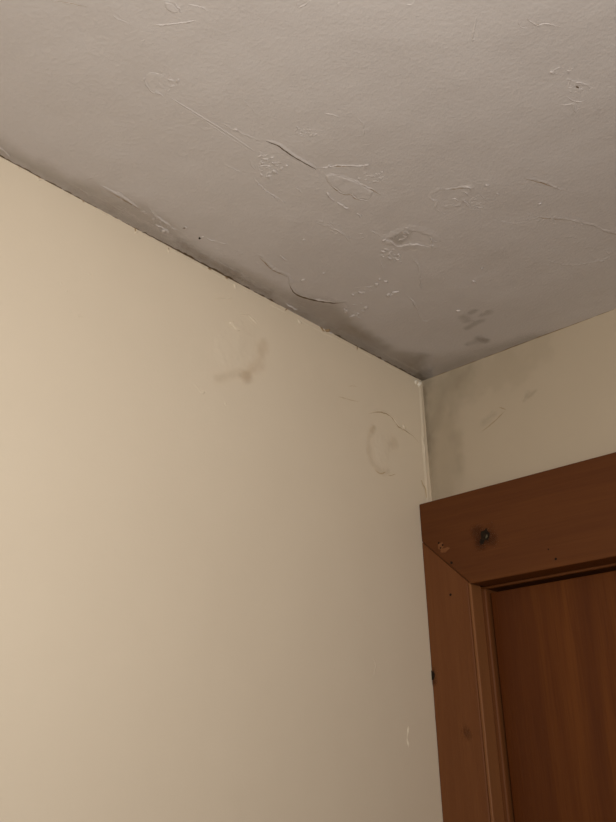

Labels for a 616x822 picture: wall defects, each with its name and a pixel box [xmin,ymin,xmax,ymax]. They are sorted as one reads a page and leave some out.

crack [265,131,369,169]
crack [0,147,349,311]
crack [320,311,609,379]